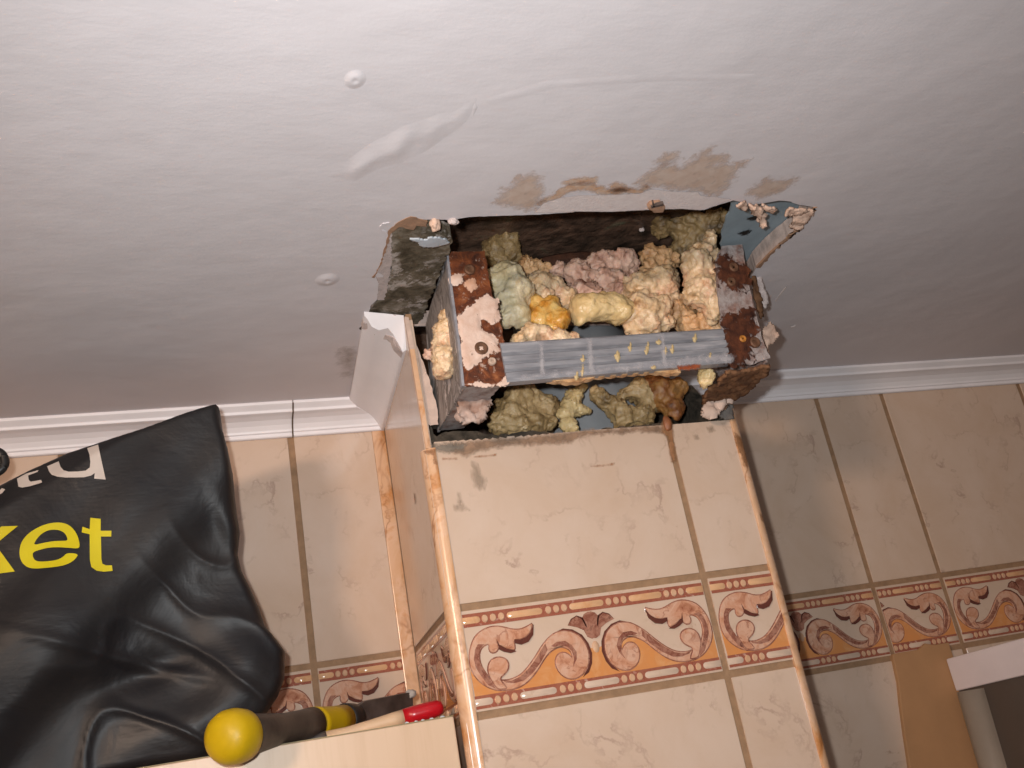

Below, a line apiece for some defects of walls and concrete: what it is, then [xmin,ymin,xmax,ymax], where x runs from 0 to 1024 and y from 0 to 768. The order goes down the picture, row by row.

damp [496,149,745,208]
damp [749,178,792,197]
flaking render [534,189,817,268]
peeling [361,216,453,358]
rust [713,253,761,369]